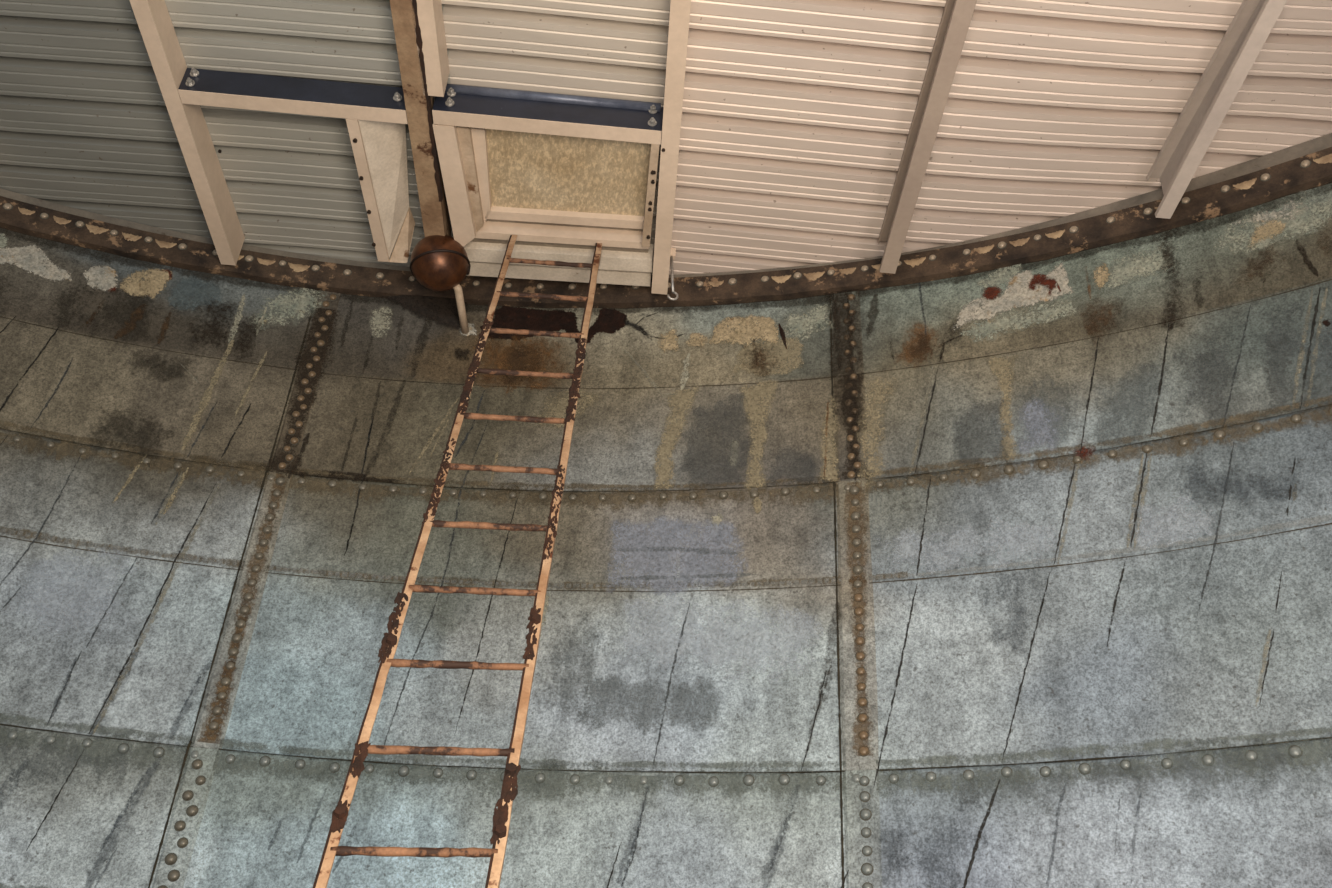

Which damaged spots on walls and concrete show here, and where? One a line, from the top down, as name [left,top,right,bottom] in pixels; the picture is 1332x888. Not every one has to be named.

peeling [0,234,172,298]
corrosion [982,286,1001,300]
corrosion [1028,273,1061,294]
peeling [952,245,1176,342]
corrosion [455,337,562,389]
crack [1107,324,1169,646]
crack [454,492,520,735]
crack [963,338,1099,888]
crack [1256,571,1282,705]
crack [607,603,690,888]